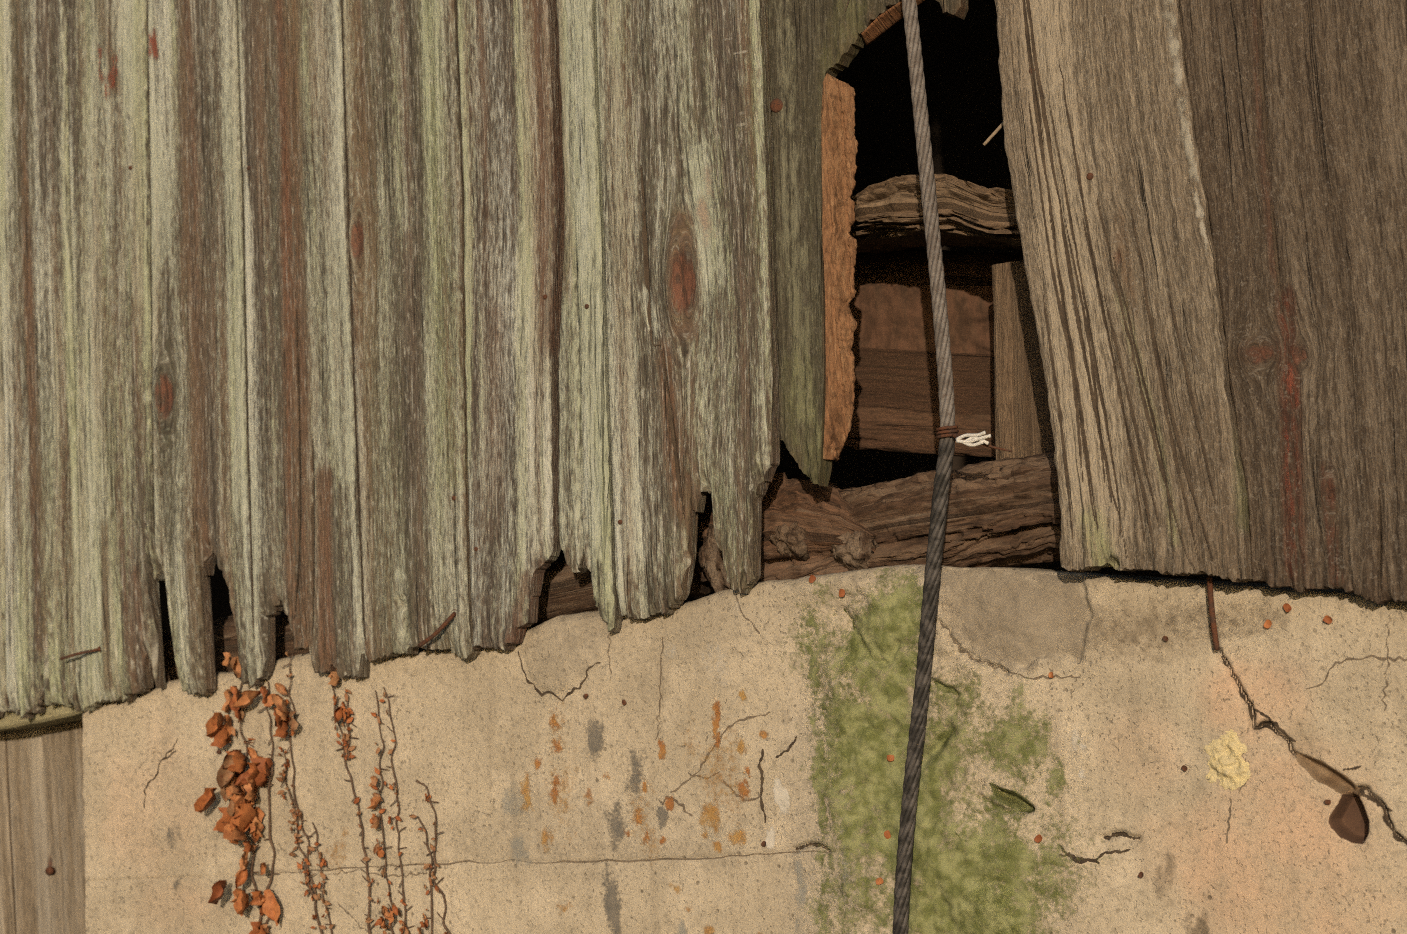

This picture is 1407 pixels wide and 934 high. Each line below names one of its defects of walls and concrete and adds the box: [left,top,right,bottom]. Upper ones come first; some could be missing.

crack [518,632,612,702]
crack [247,712,836,932]
corrosion [549,714,562,751]
corrosion [550,775,567,804]
corrosion [701,701,750,852]
leakage [796,615,848,934]
leakage [957,793,1008,934]
leakage [977,683,1083,806]
leakage [1035,836,1074,913]
crack [1218,650,1296,843]
spalling [1296,752,1369,844]
crack [1343,766,1407,845]